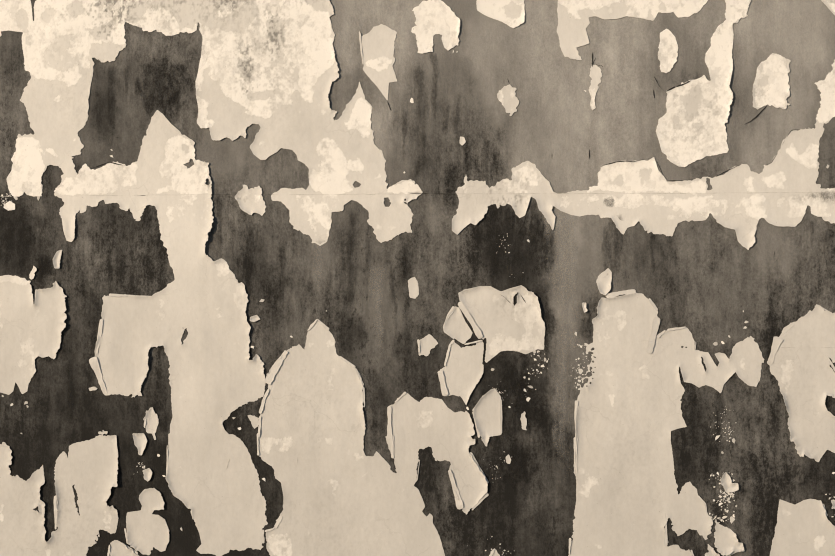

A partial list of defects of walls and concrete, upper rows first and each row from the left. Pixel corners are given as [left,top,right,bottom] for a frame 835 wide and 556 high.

peeling [0,0,545,556]
crack [517,149,692,194]
peeling [452,0,835,250]
peeling [568,268,835,556]